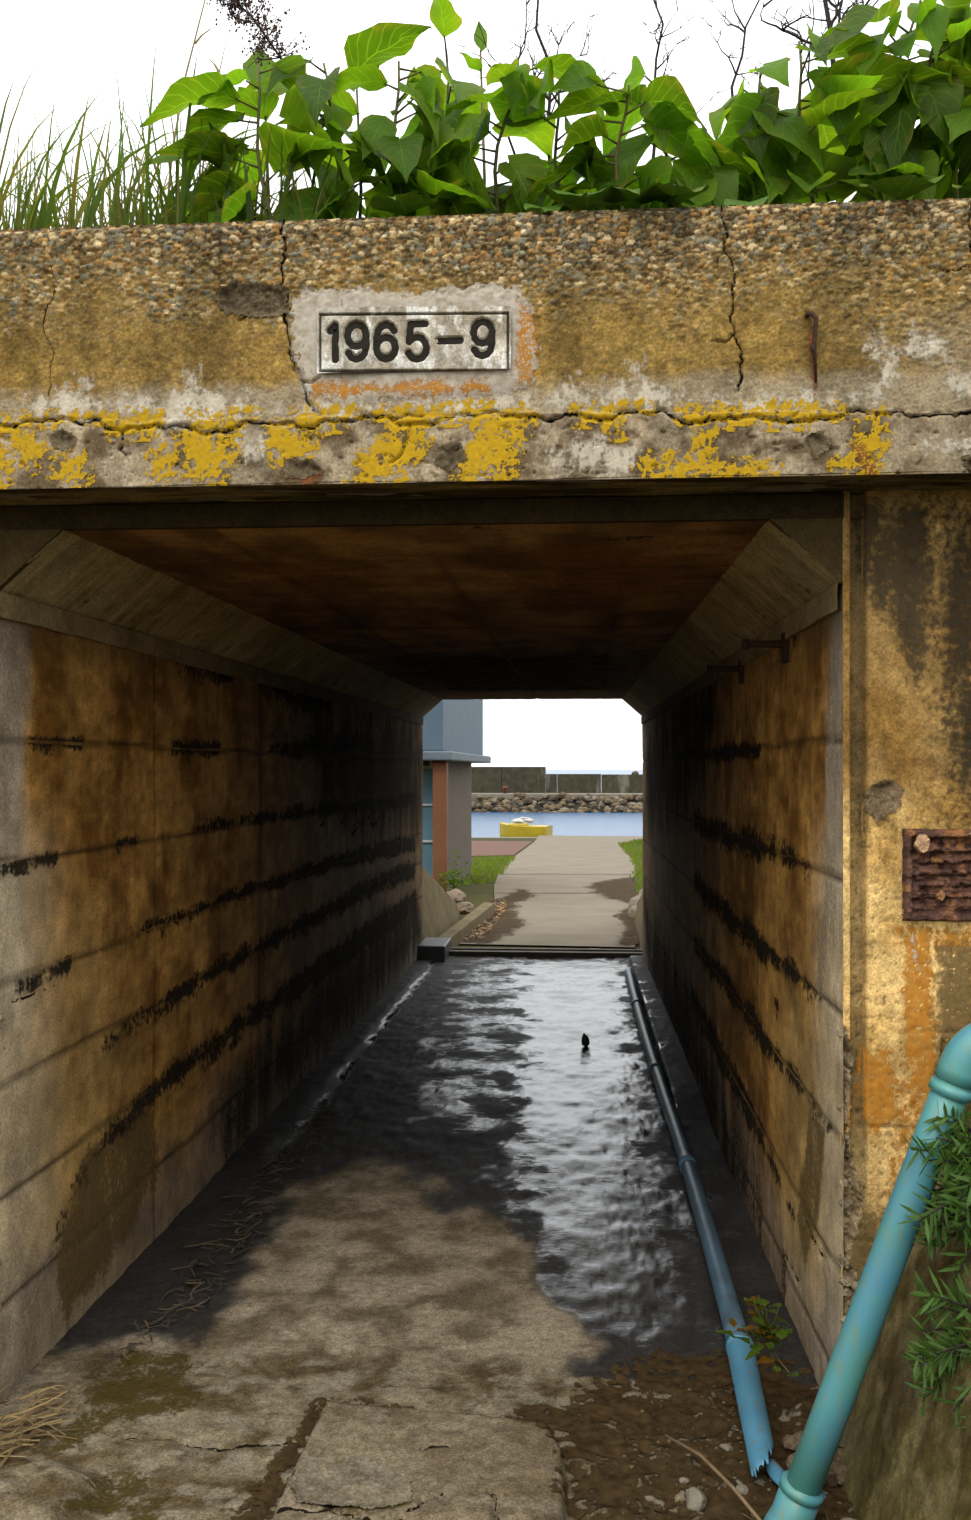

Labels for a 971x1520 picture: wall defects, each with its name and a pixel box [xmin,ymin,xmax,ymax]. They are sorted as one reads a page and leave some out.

crack [0,204,971,461]
rust [805,311,819,396]
rust [852,443,878,475]
damp [853,490,971,820]
damp [0,851,58,877]
rust [913,834,930,854]
damp [15,955,73,996]
damp [28,684,423,1320]
damp [584,877,833,1303]
spalling [836,1026,864,1324]
crack [276,1493,443,1520]